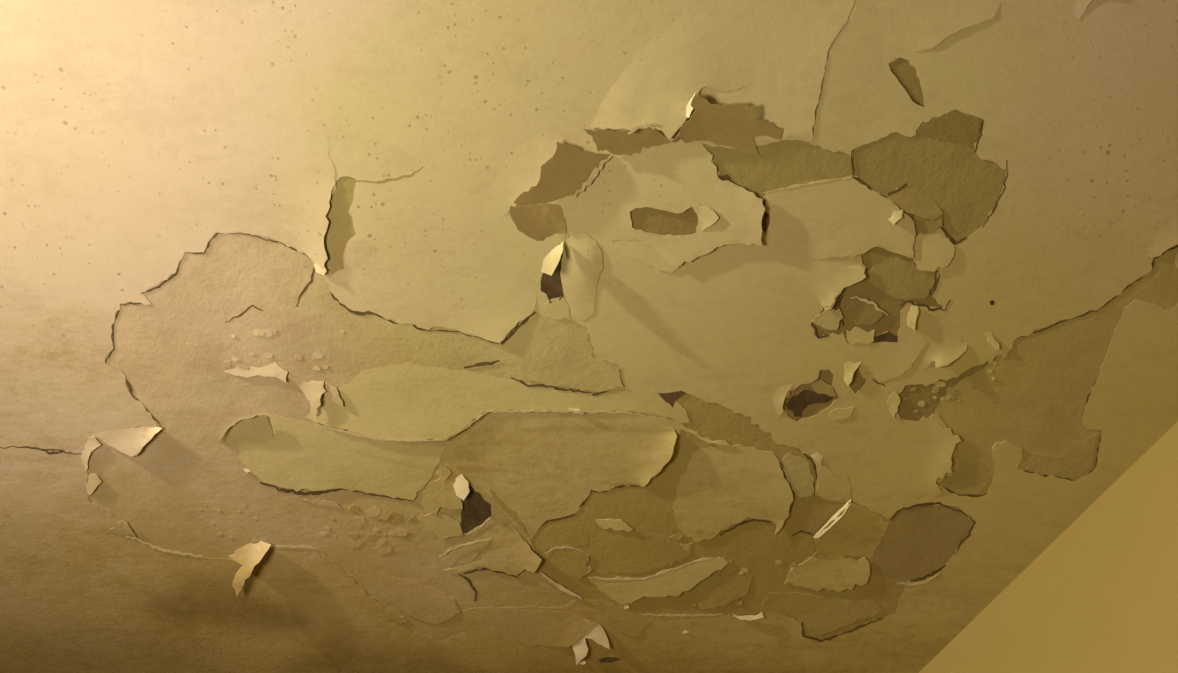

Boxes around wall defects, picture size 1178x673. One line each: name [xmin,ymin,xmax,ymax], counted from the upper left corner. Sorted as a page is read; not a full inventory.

peeling [889,57,924,107]
spalling [81,93,1178,665]
crack [0,446,82,455]